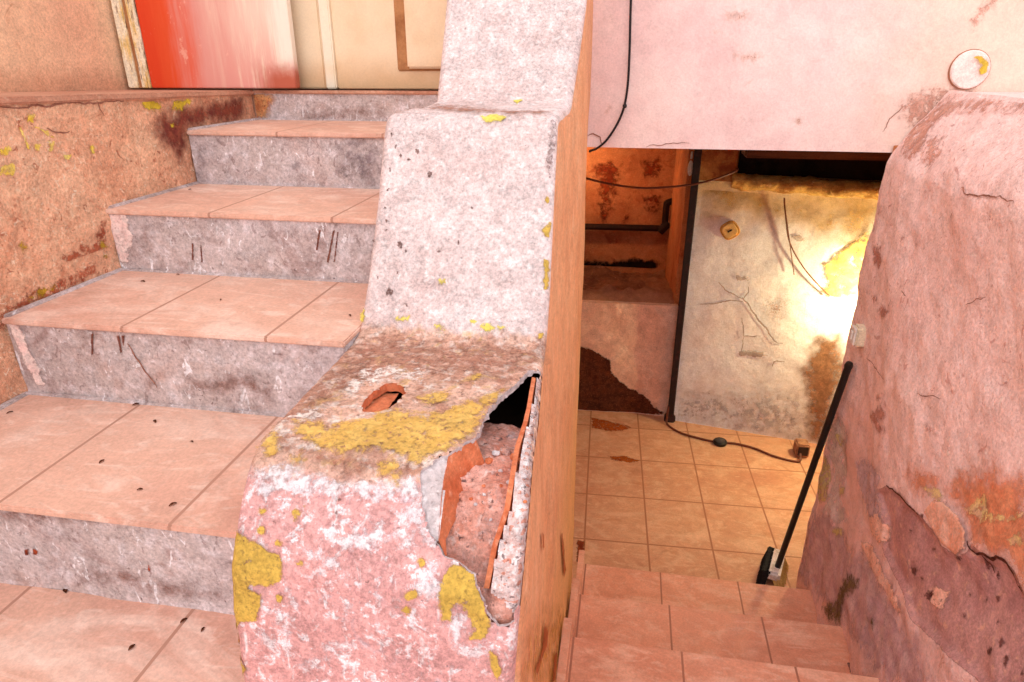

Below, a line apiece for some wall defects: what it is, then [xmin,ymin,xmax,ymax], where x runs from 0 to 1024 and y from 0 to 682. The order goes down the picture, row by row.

water stain [594,161,620,221]
water stain [641,159,661,178]
crack [950,187,1014,218]
crack [708,282,785,366]
spalling [578,347,663,415]
water stain [684,335,843,441]
corrosion [592,418,631,431]
spalling [256,365,542,627]
spalling [823,418,1024,682]
crack [967,540,1022,592]
peeling [304,597,351,671]
peeling [450,613,492,658]